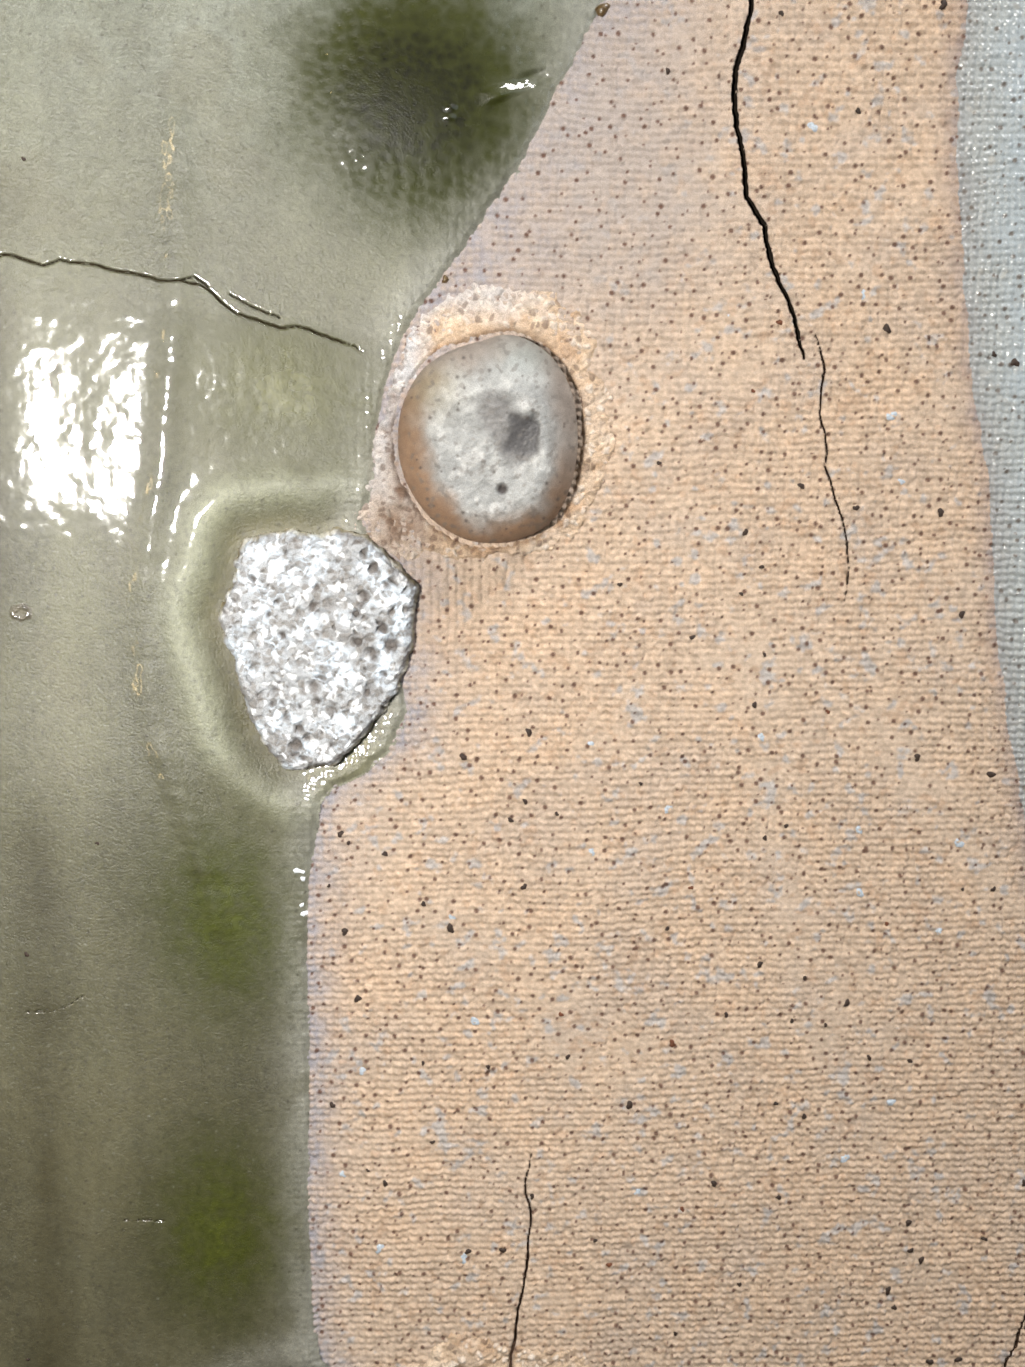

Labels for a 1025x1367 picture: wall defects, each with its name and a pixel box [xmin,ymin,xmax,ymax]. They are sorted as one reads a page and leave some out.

leakage [302,0,531,215]
crack [0,253,362,352]
crack [732,0,849,601]
crack [509,1153,532,1367]
crack [1004,1315,1025,1367]